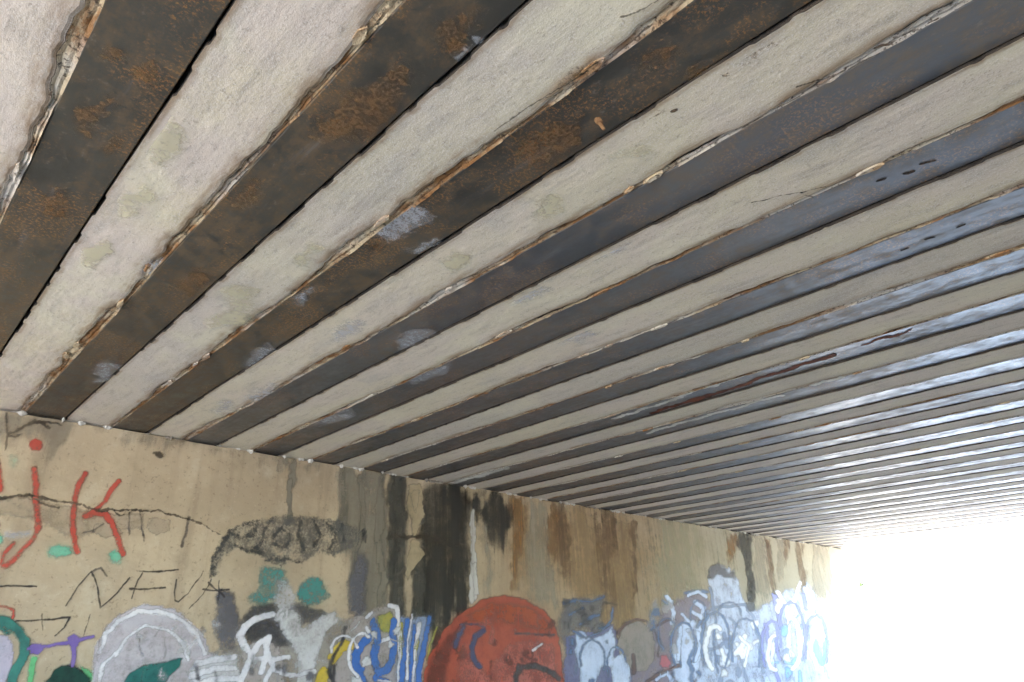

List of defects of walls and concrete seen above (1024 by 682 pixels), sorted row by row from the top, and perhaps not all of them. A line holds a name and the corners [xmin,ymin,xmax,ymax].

corrosion [309,66,410,142]
spalling [0,0,404,413]
spalling [111,0,1024,468]
corrosion [650,353,837,414]
corrosion [861,328,913,346]
crack [0,493,220,535]
leakage [336,467,514,651]
corrosion [509,496,527,590]